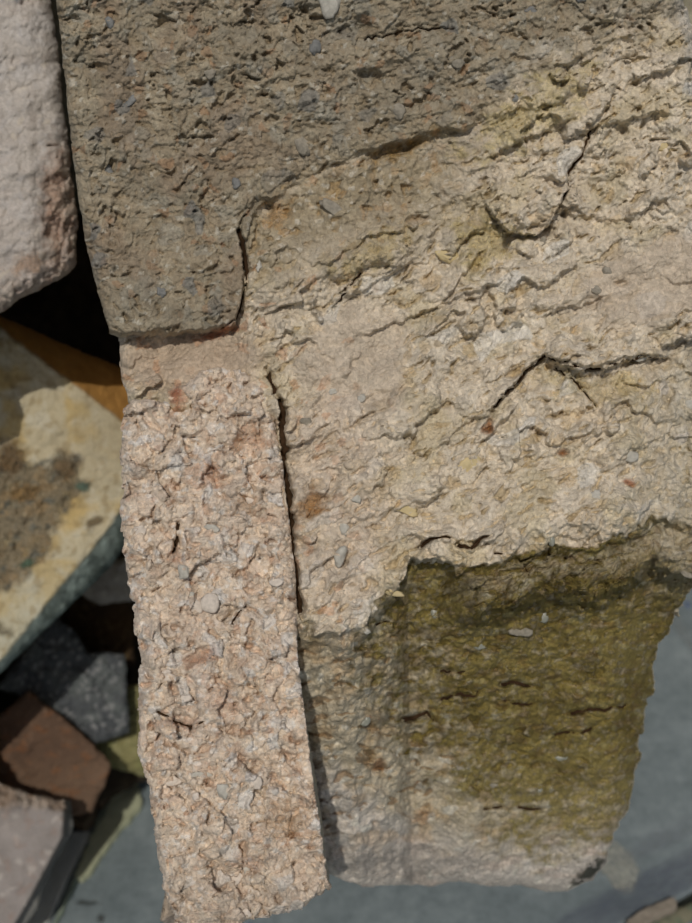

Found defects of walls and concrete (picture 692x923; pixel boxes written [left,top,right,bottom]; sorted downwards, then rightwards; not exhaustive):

crack [111,24,692,637]
water stain [355,517,692,889]